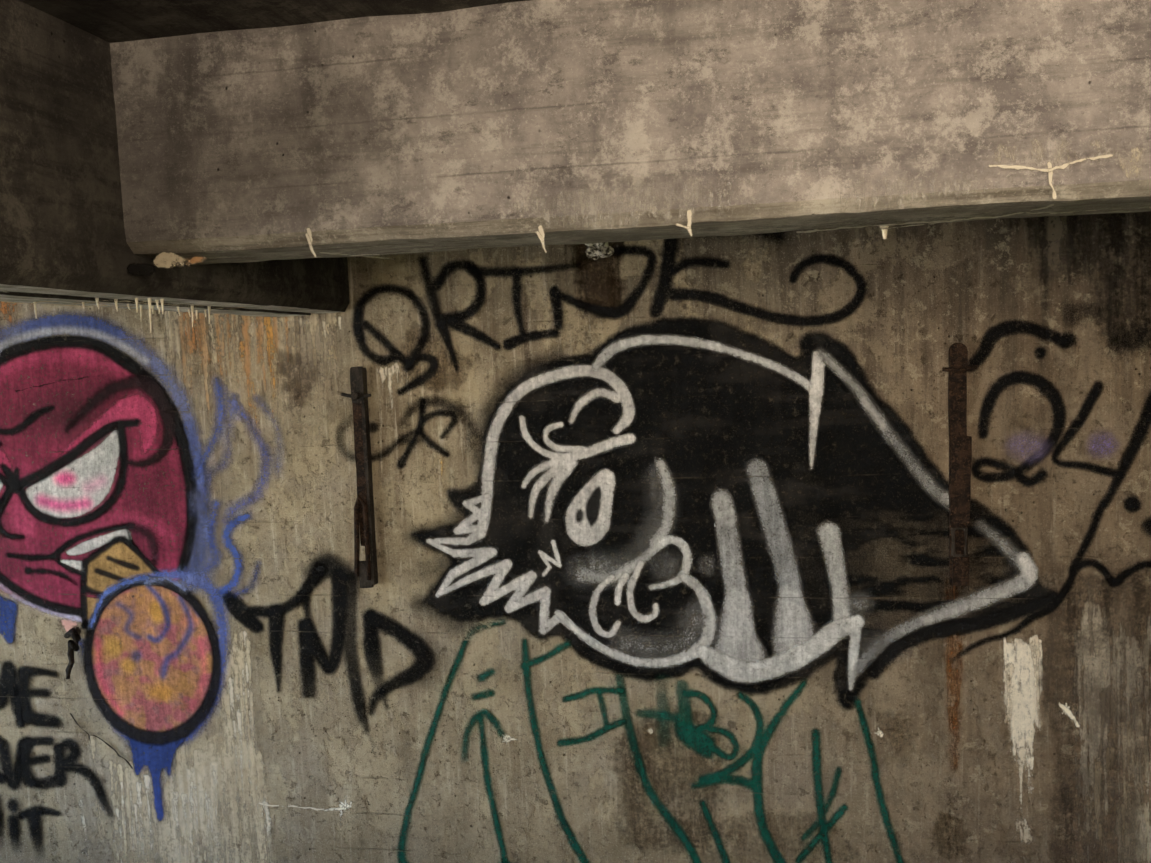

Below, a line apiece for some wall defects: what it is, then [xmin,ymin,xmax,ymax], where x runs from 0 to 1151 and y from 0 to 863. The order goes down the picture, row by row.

crack [797,154,1113,233]
water stain [1009,205,1151,350]
water stain [614,709,775,854]
rust [946,633,962,769]
water stain [1003,570,1151,863]